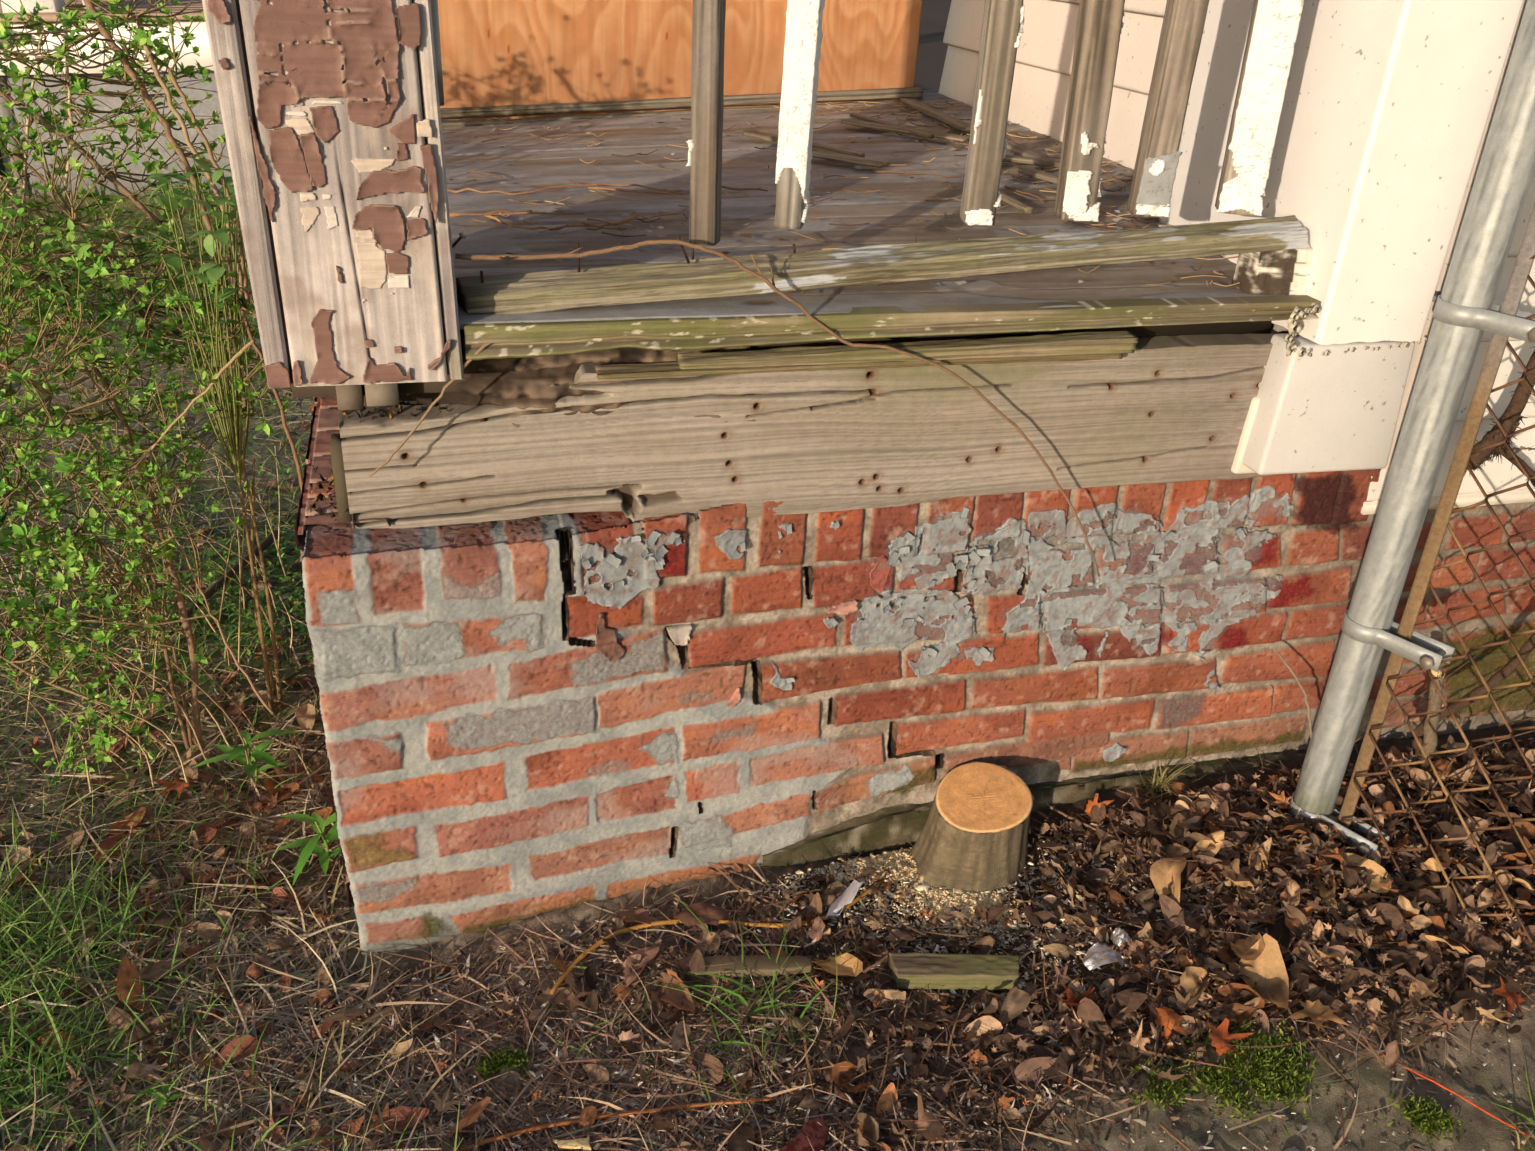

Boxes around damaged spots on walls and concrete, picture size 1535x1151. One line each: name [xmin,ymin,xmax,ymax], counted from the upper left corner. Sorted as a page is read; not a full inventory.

peeling [208,0,231,24]
peeling [249,0,439,303]
peeling [265,309,451,389]
crack [555,524,597,647]
peeling [579,530,685,664]
peeling [714,528,747,560]
crack [803,566,814,600]
peeling [823,485,1294,694]
crack [665,626,764,705]
crack [827,697,838,725]
crack [887,721,945,769]
crack [669,802,703,858]